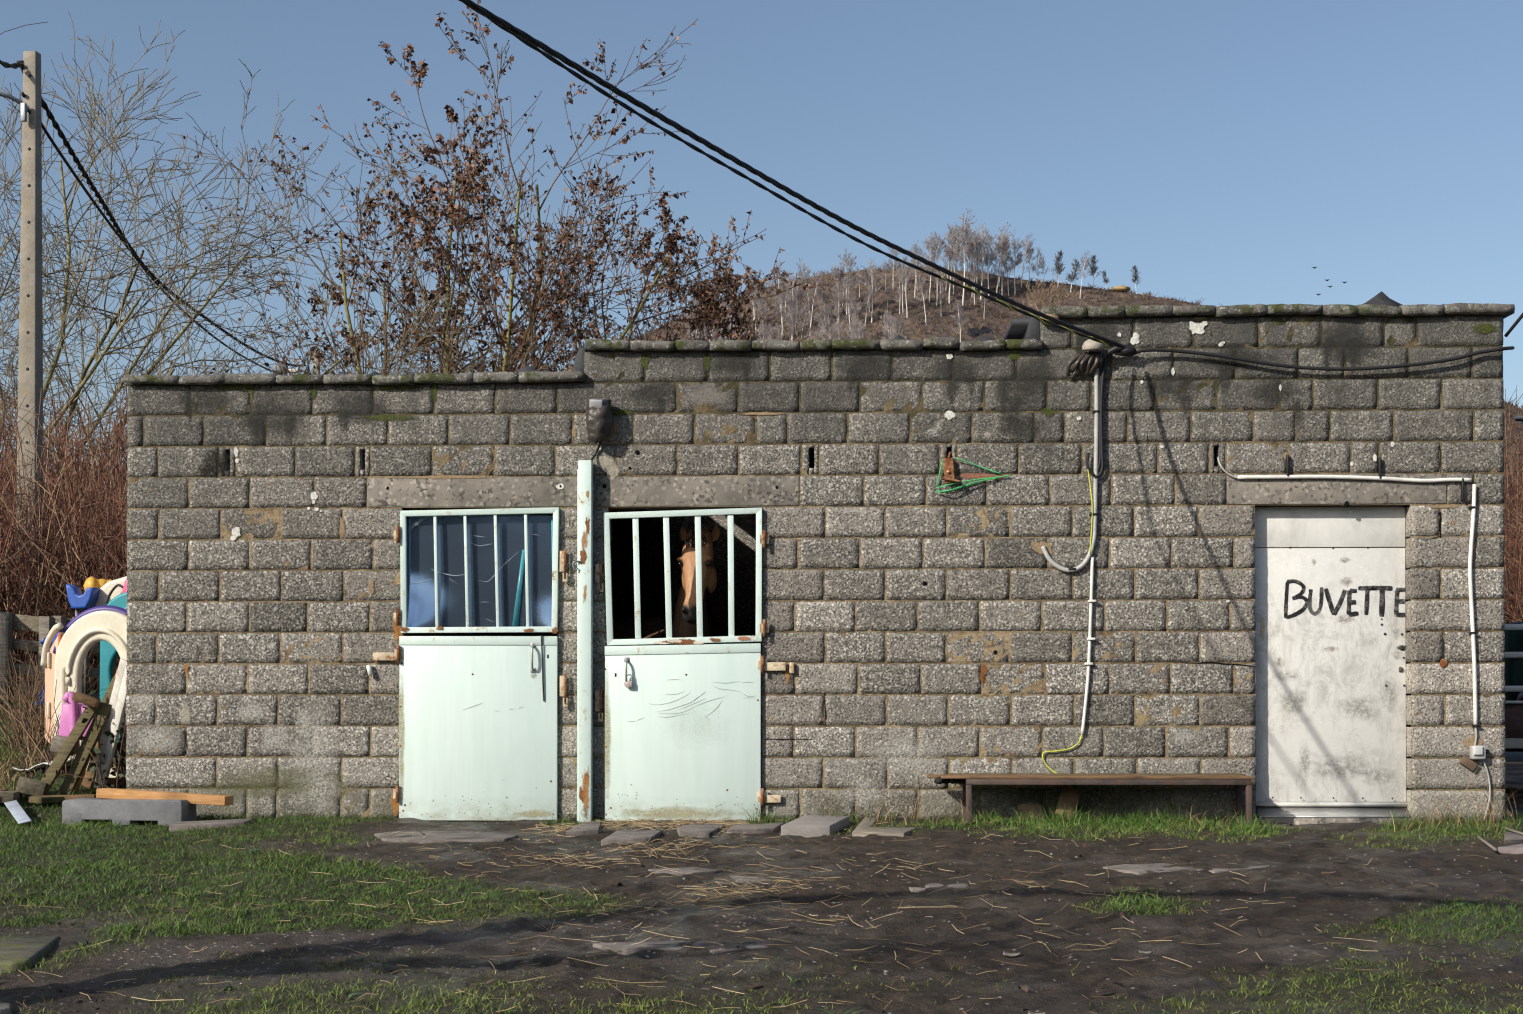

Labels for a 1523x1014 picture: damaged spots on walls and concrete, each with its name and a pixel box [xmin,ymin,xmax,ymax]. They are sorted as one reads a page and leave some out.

leakage [1077,326,1117,352]
corrosion [580,517,590,564]